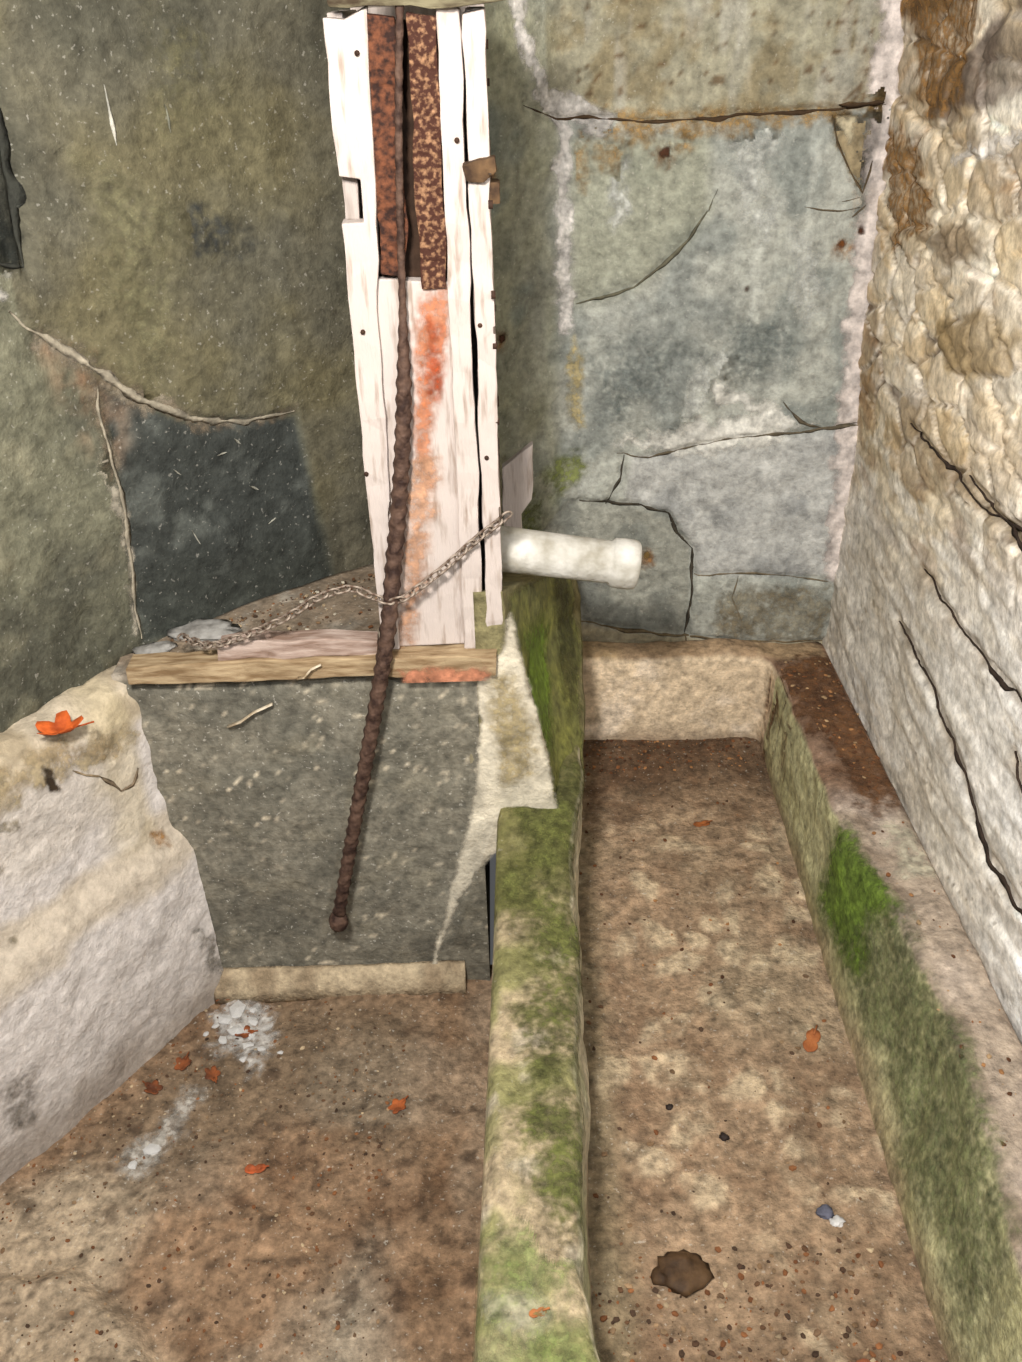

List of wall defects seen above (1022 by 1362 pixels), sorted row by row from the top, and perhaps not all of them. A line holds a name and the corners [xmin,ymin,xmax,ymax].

crack [523,100,886,124]
crack [576,189,718,304]
corrosion [399,292,448,642]
crack [579,402,858,643]
crack [910,423,1022,552]
crack [924,569,1022,702]
crack [899,621,1022,915]